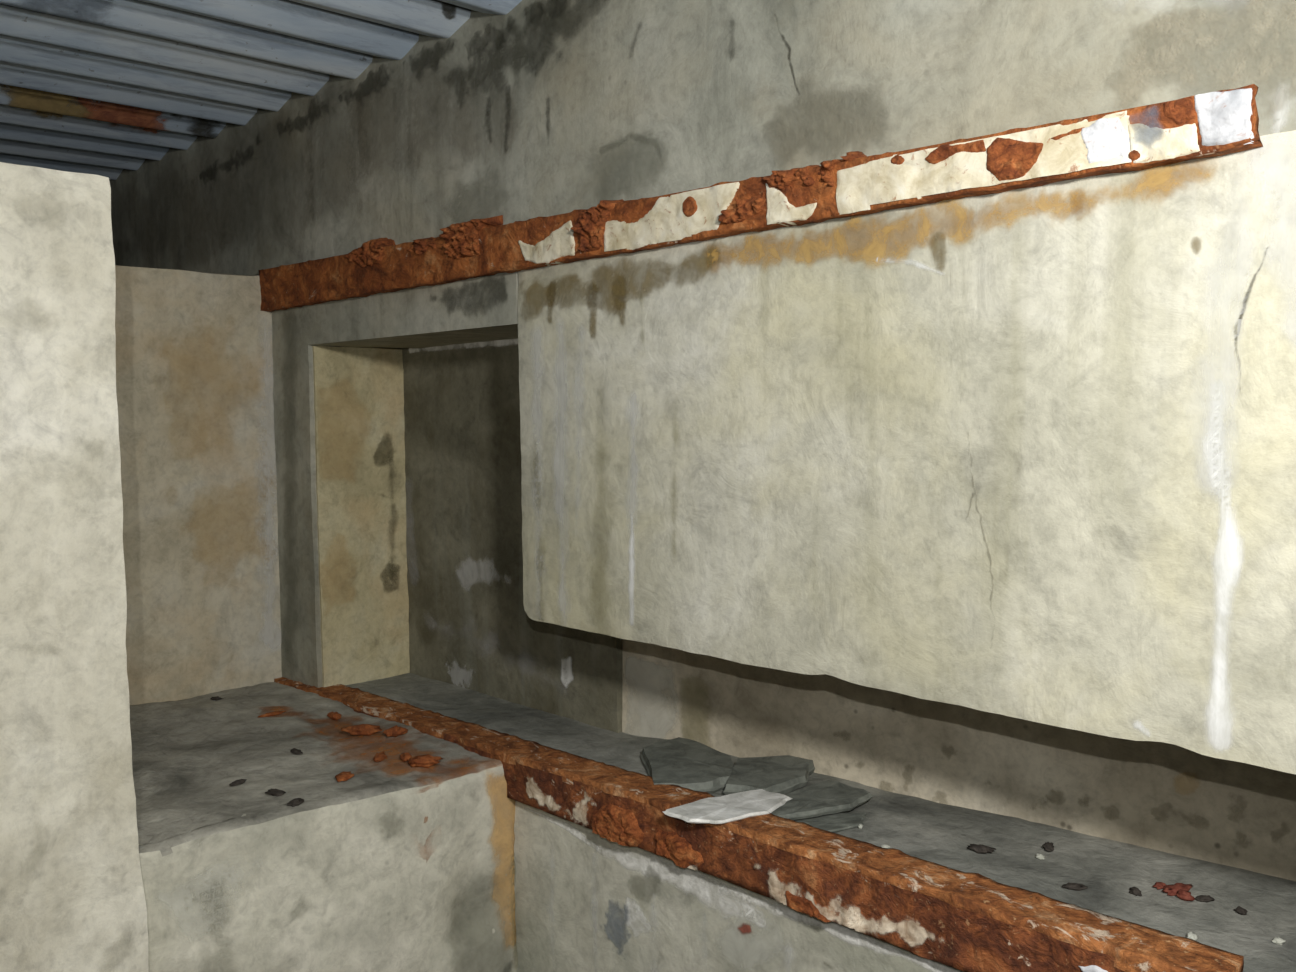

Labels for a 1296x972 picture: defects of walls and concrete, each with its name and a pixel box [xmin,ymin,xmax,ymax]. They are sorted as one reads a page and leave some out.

corrosion [3,84,176,133]
corrosion [1145,97,1196,140]
corrosion [925,127,1085,181]
peeling [836,88,1254,215]
corrosion [1128,150,1209,193]
peeling [518,220,575,266]
peeling [604,182,740,252]
corrosion [682,196,697,217]
peeling [766,183,817,226]
corrosion [707,192,1093,264]
crack [1237,274,1256,336]
leakage [1206,395,1242,749]